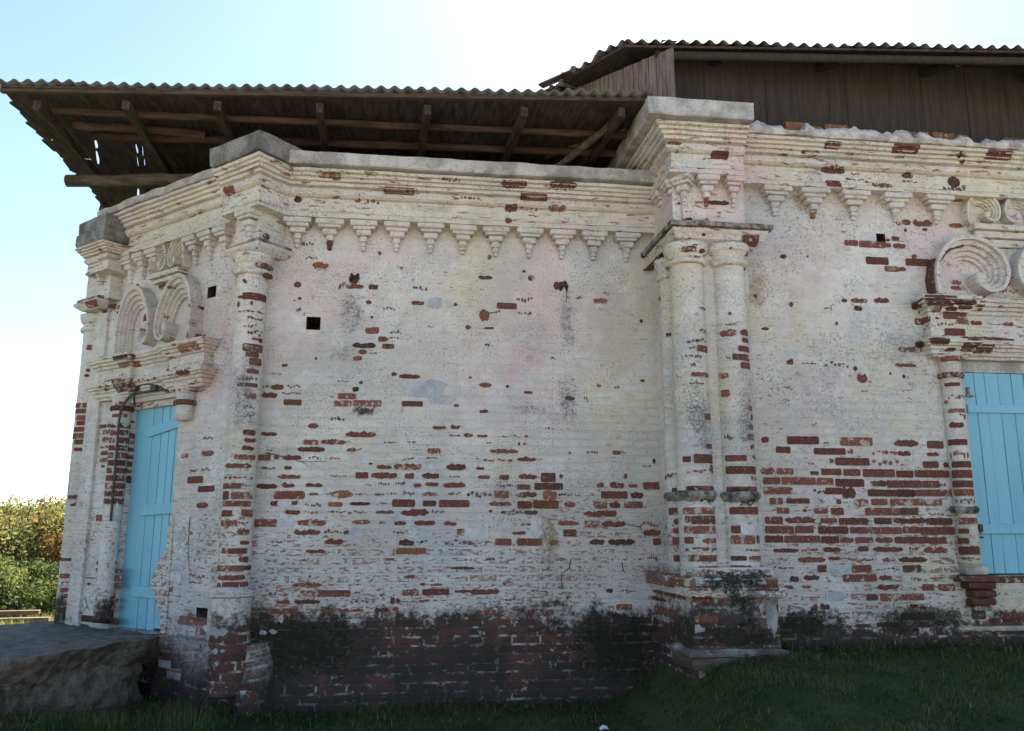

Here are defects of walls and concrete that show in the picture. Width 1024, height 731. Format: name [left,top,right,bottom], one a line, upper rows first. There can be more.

peeling [317,170,341,180]
flaking render [355,186,414,205]
flaking render [501,179,577,223]
flaking render [844,219,933,272]
flaking render [72,403,87,451]
flaking render [96,353,205,521]
flaking render [181,273,980,628]
flaking render [177,607,218,655]